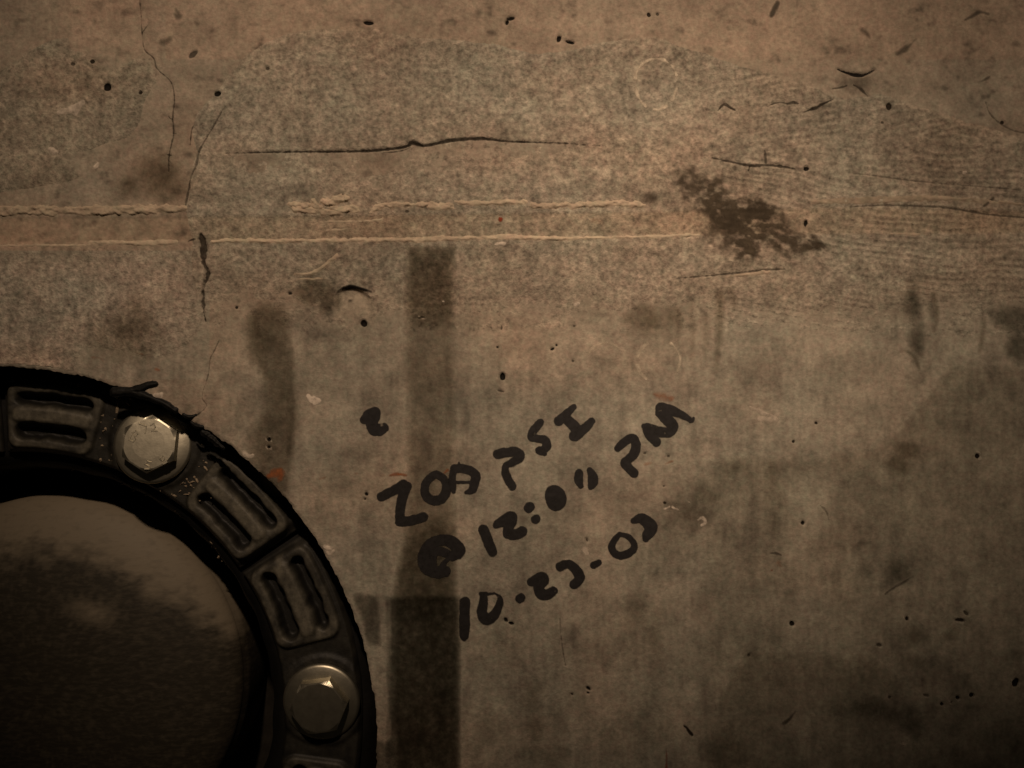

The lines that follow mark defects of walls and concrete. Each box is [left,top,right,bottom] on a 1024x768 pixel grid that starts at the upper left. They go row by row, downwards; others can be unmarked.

crack [249,137,585,153]
crack [713,151,795,171]
crack [189,233,211,321]